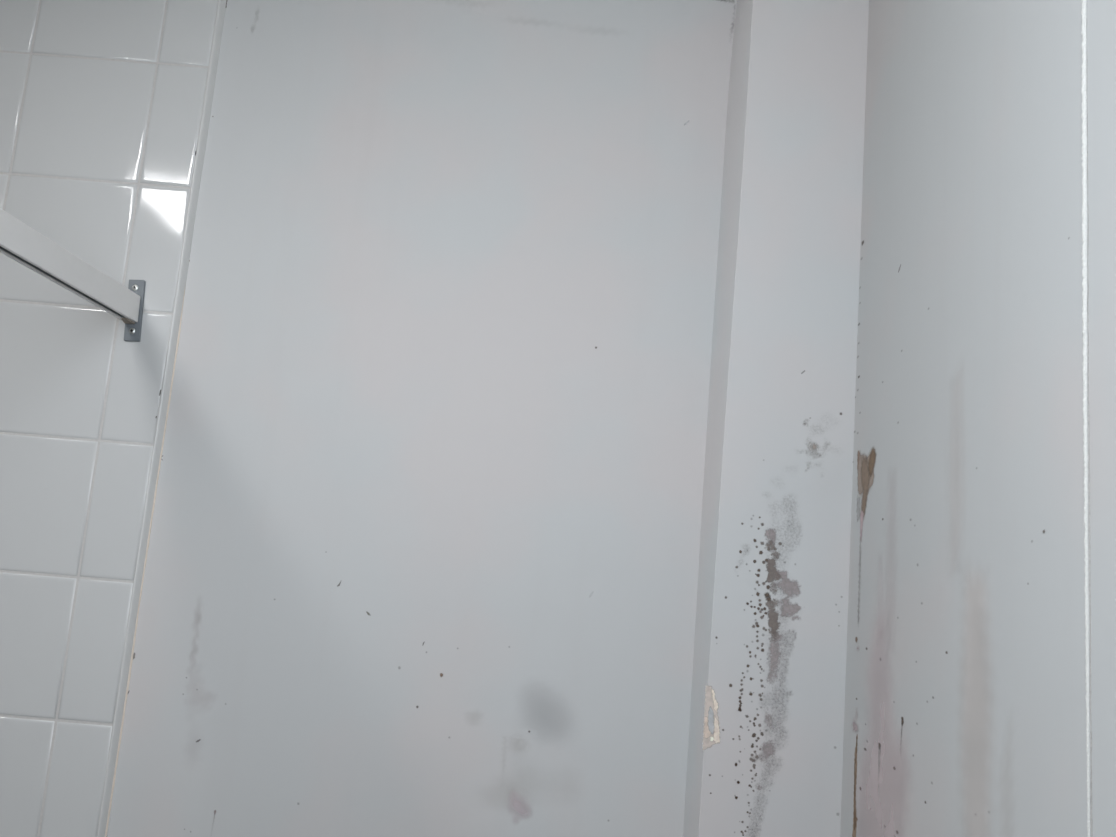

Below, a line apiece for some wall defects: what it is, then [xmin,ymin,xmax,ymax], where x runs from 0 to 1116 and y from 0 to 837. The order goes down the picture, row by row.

peeling [703,685,720,750]
damp [722,517,801,836]